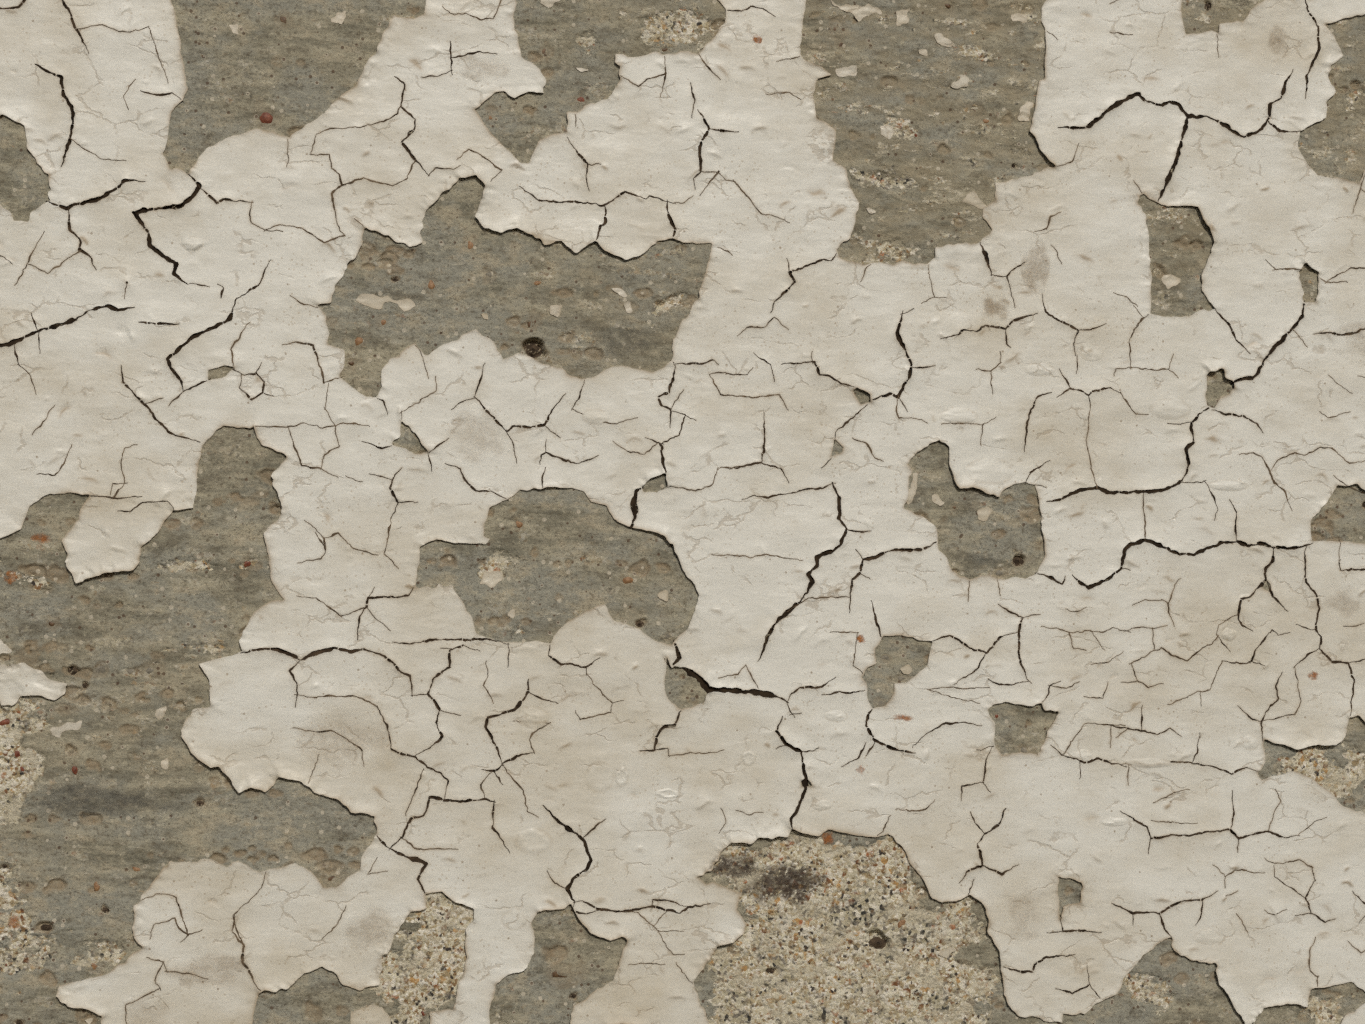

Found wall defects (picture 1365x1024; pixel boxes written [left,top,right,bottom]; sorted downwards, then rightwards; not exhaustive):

crack [62,0,184,110]
peeling [163,0,426,173]
crack [0,41,790,442]
peeling [318,175,712,397]
peeling [800,0,1055,265]
crack [1053,0,1320,204]
crack [87,444,174,512]
peeling [0,426,377,1024]
peeling [416,487,707,709]
crack [241,242,1365,998]
crack [125,872,266,1024]
spalling [693,829,1365,1024]